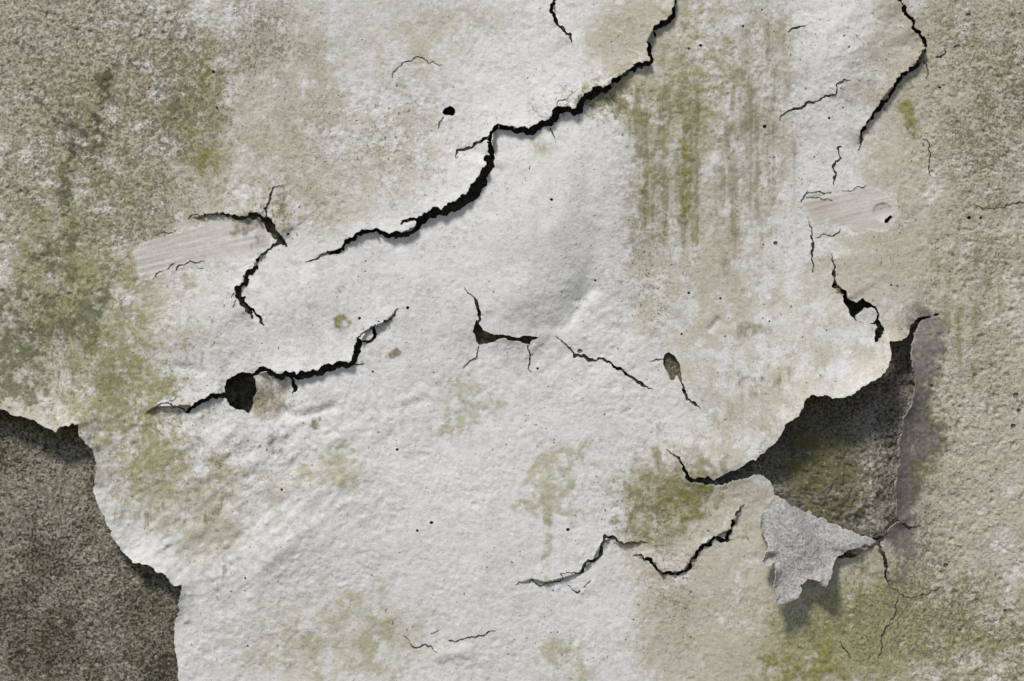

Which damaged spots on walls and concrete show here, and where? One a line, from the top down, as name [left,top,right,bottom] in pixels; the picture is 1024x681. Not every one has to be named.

crack [153,0,677,326]
water stain [629,85,700,244]
crack [801,0,960,201]
crack [144,308,398,415]
crack [556,336,652,389]
crack [809,225,884,343]
peeling [653,294,945,604]
spalling [0,409,182,681]
crack [517,505,744,593]
crack [870,516,941,657]